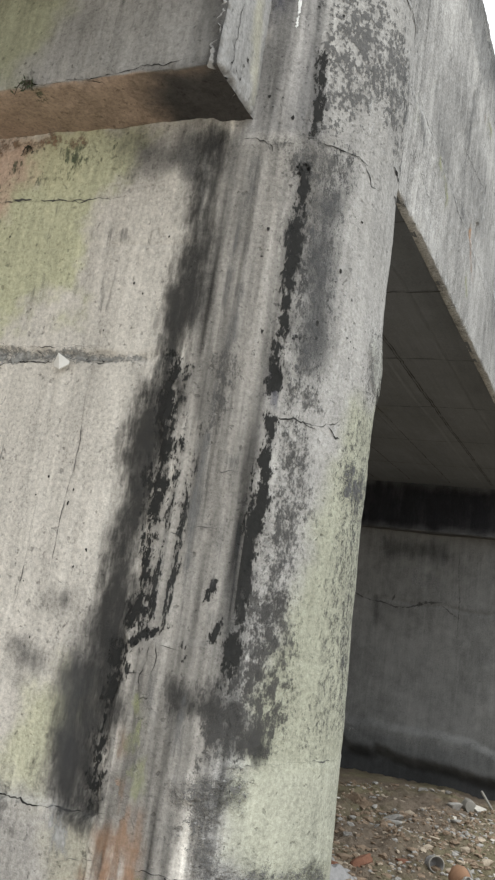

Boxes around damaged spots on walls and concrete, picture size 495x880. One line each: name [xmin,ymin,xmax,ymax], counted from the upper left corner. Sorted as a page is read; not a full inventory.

damp [309,50,328,137]
crack [3,195,127,203]
damp [268,138,352,198]
crack [1,344,132,364]
crack [277,417,343,441]
damp [48,130,240,852]
damp [168,198,338,774]
damp [302,334,495,751]
crack [355,554,460,642]
crack [0,793,77,811]
spalling [171,762,325,880]